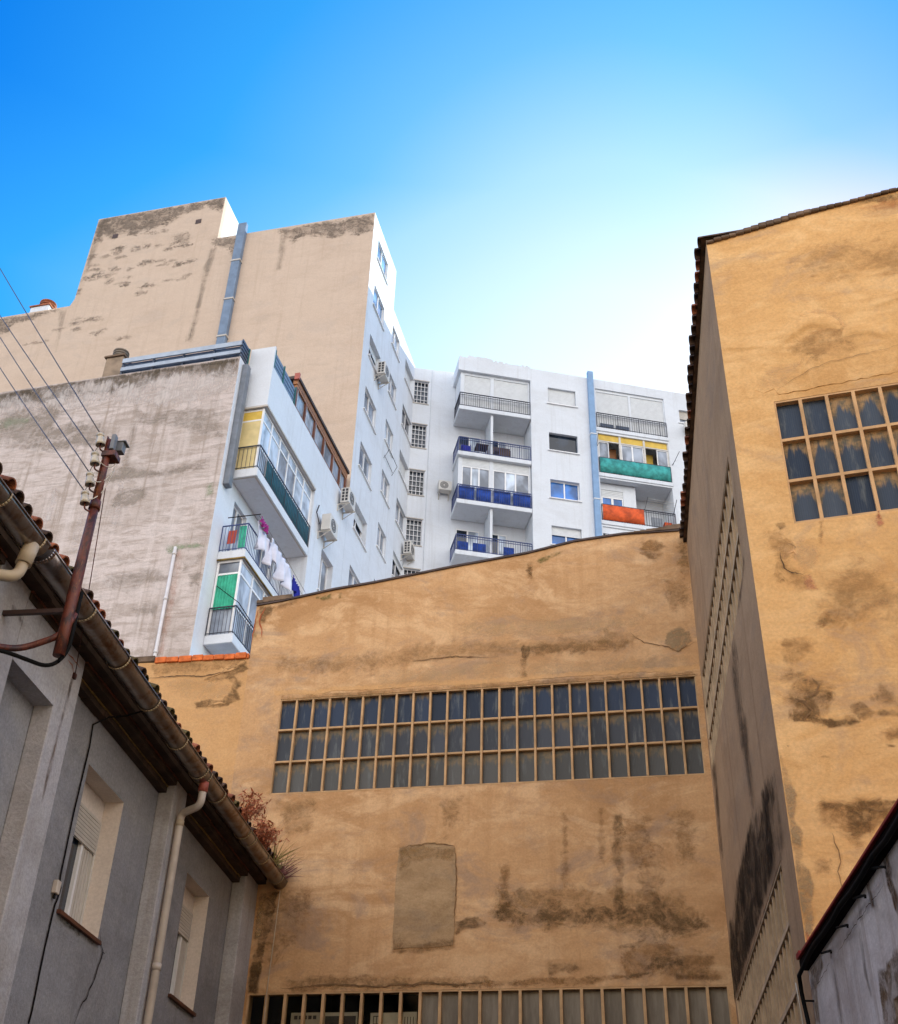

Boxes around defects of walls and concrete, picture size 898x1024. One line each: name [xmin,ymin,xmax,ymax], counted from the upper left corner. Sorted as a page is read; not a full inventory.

water stain [786,673,863,727]
water stain [729,668,775,1000]
water stain [822,799,891,887]
water stain [496,889,702,934]